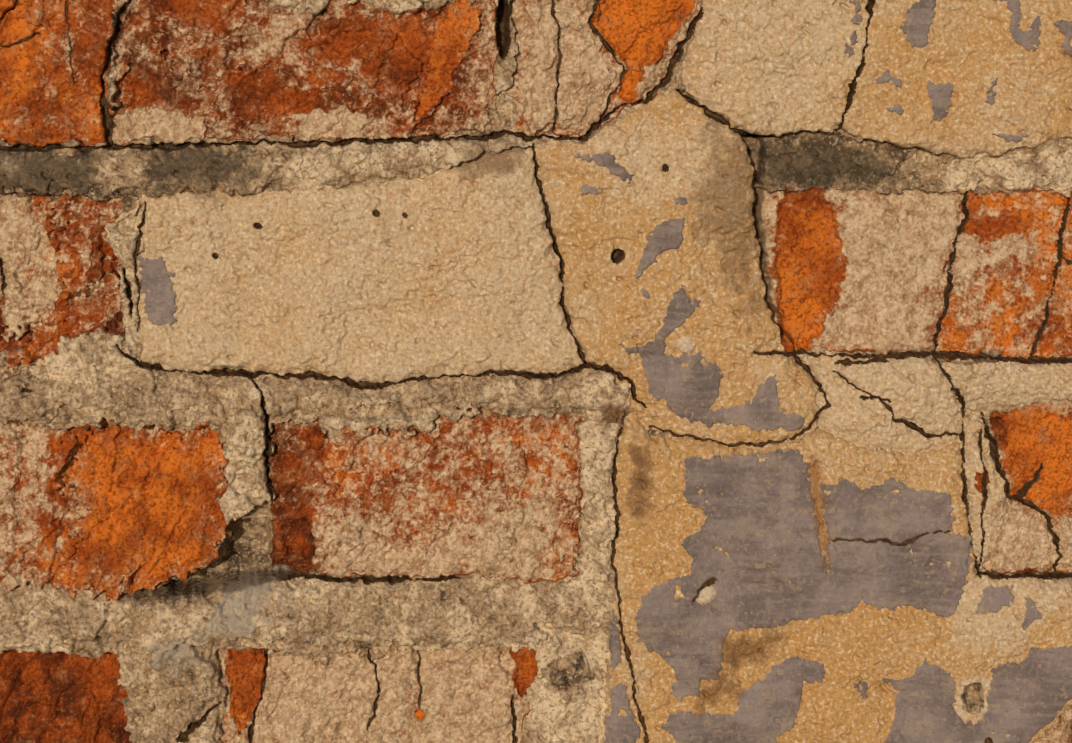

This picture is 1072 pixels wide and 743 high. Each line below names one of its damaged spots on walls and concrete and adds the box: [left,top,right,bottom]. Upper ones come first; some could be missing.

spalling [118,0,482,142]
spalling [592,0,696,103]
crack [835,0,876,132]
spalling [772,187,850,352]
spalling [975,184,1072,365]
crack [0,0,785,743]
peeling [619,287,805,432]
crack [649,190,1072,580]
spalling [50,418,238,602]
spalling [989,402,1072,566]
peeling [635,449,973,743]
peeling [882,645,1072,743]